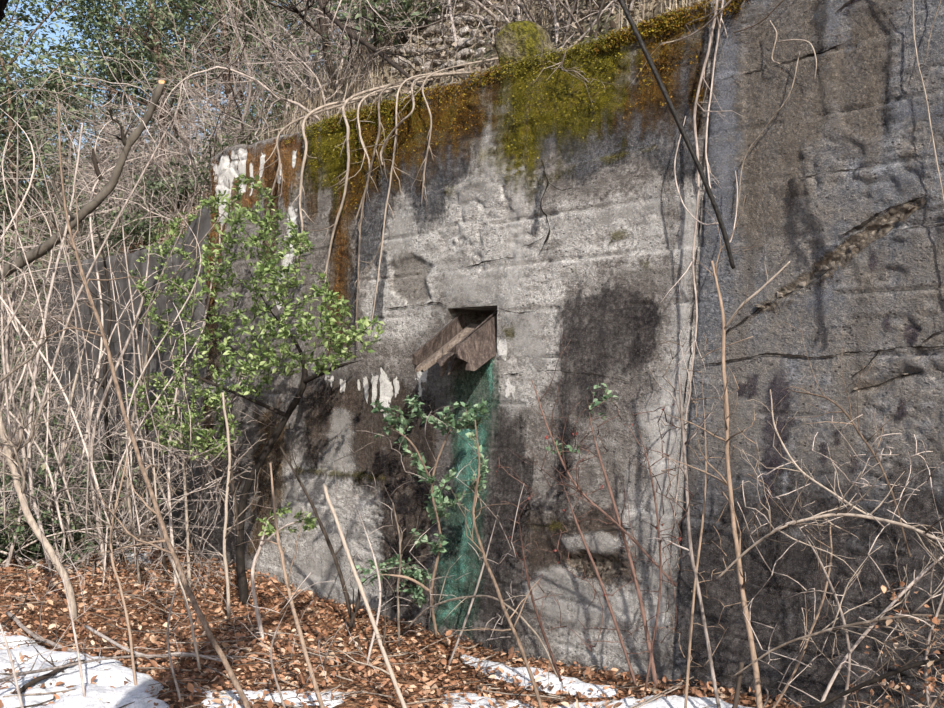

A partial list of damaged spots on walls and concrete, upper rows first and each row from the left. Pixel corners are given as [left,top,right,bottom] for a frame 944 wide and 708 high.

corrosion [202,126,366,458]
leakage [295,22,944,708]
crack [664,142,944,623]
spalling [725,197,927,334]